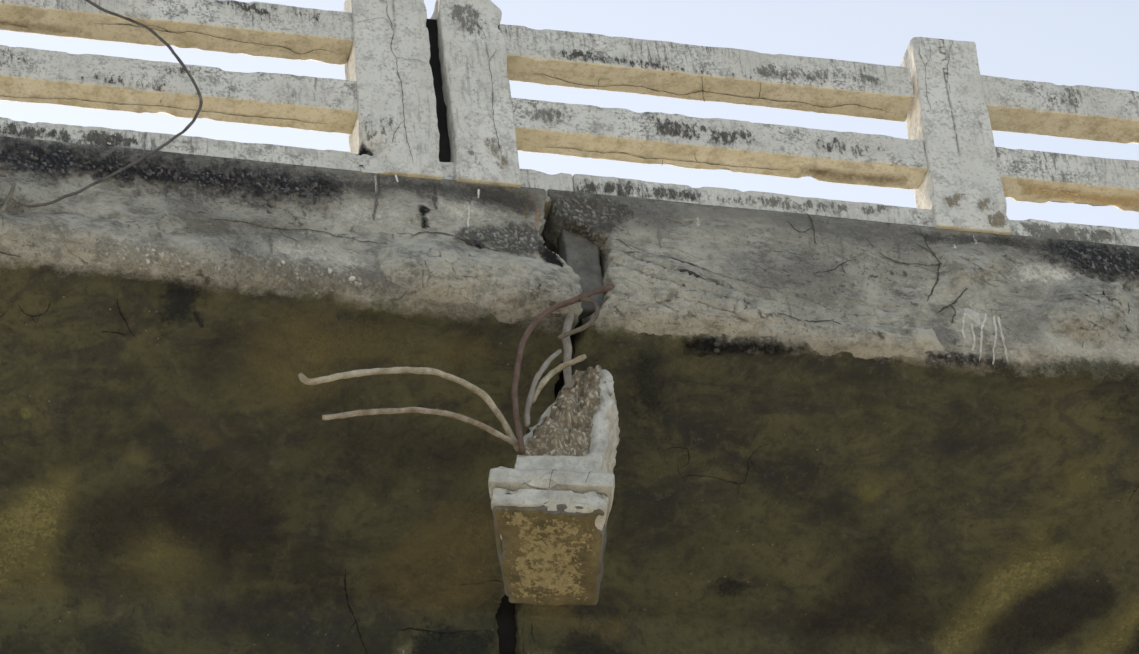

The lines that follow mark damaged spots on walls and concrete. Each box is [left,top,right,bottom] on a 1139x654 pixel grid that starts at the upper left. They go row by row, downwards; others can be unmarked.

crack [359,1,425,159]
crack [919,42,953,109]
water stain [270,244,400,288]
water stain [920,233,1081,285]
water stain [162,281,203,327]
water stain [971,315,1139,382]
water stain [0,473,75,592]
peeling [502,508,600,605]
water stain [940,547,1070,654]